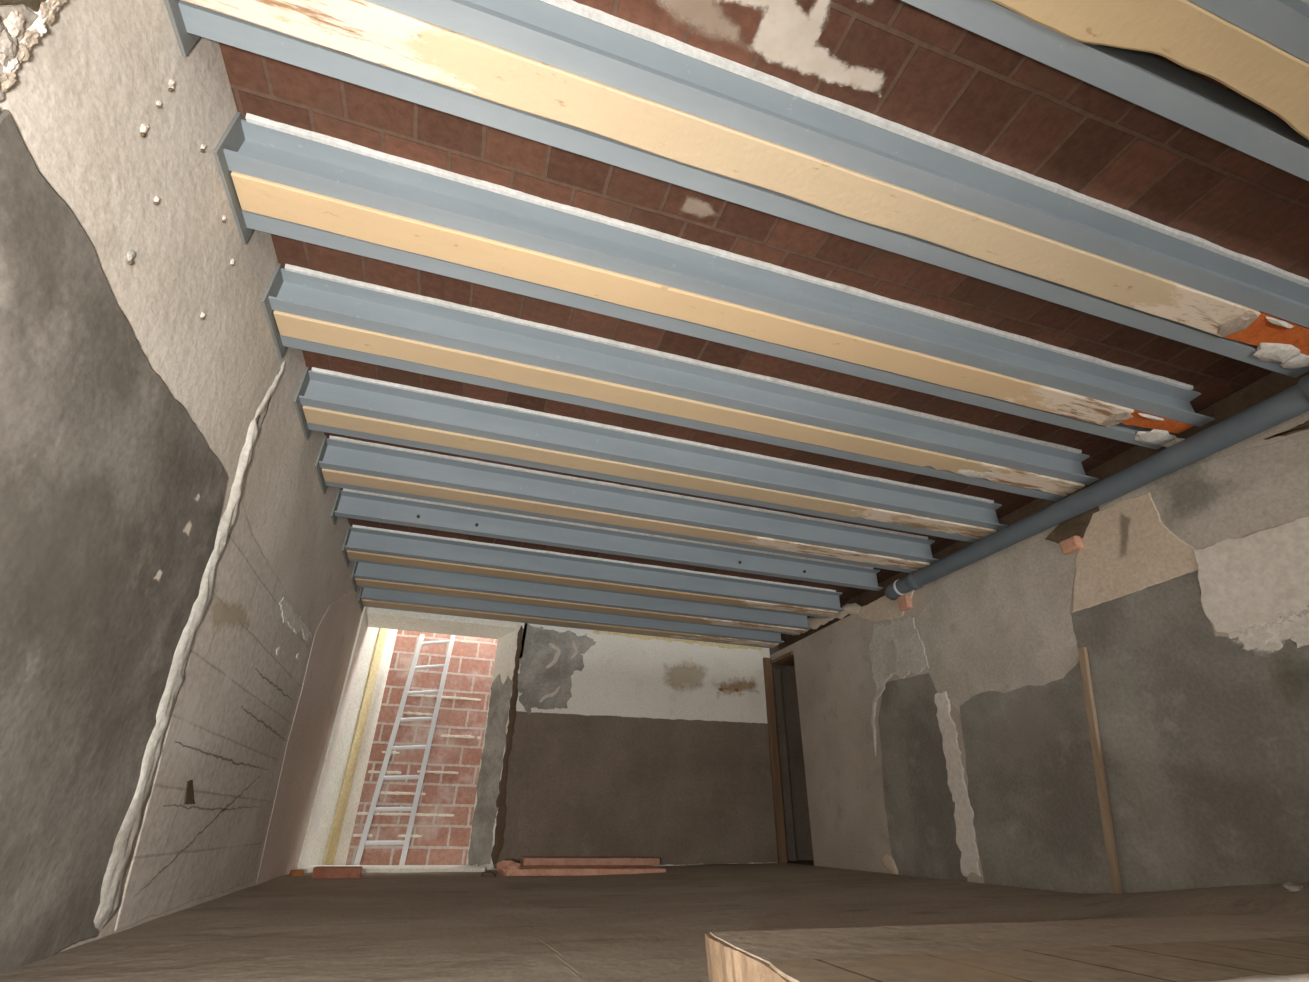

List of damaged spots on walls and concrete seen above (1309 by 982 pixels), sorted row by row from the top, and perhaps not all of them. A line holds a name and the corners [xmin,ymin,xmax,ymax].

spalling [0,0,67,102]
flaking render [1228,611,1309,653]
crack [255,668,293,700]
crack [241,706,287,741]
crack [134,741,269,897]